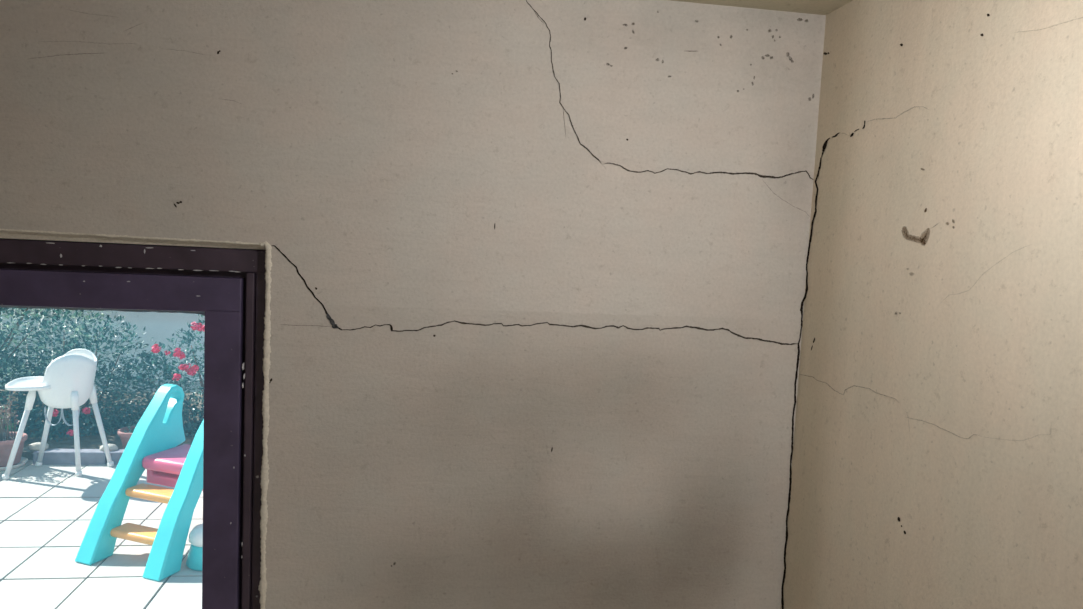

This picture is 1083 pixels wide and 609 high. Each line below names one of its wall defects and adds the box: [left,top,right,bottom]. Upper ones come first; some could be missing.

crack [272,0,895,609]